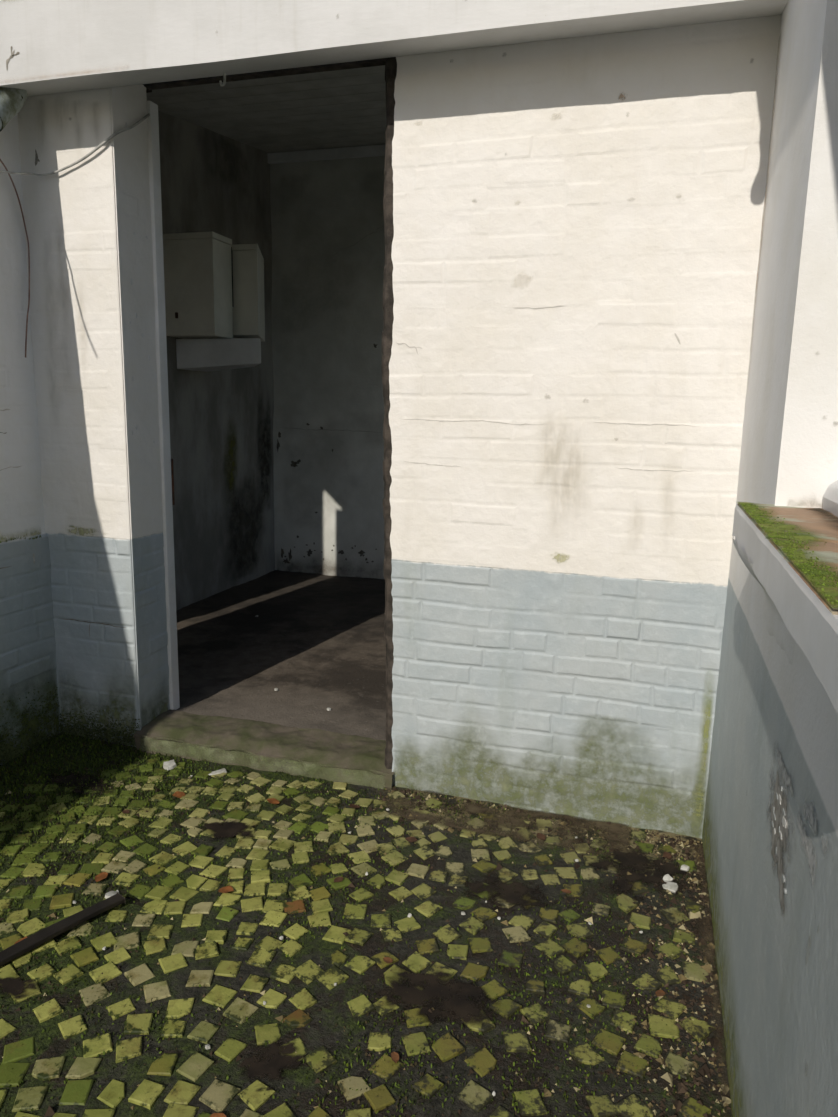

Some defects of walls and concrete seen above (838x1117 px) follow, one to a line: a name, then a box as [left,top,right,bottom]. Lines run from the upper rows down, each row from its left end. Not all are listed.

damp [229,407,272,577]
flaking render [770,768,793,914]